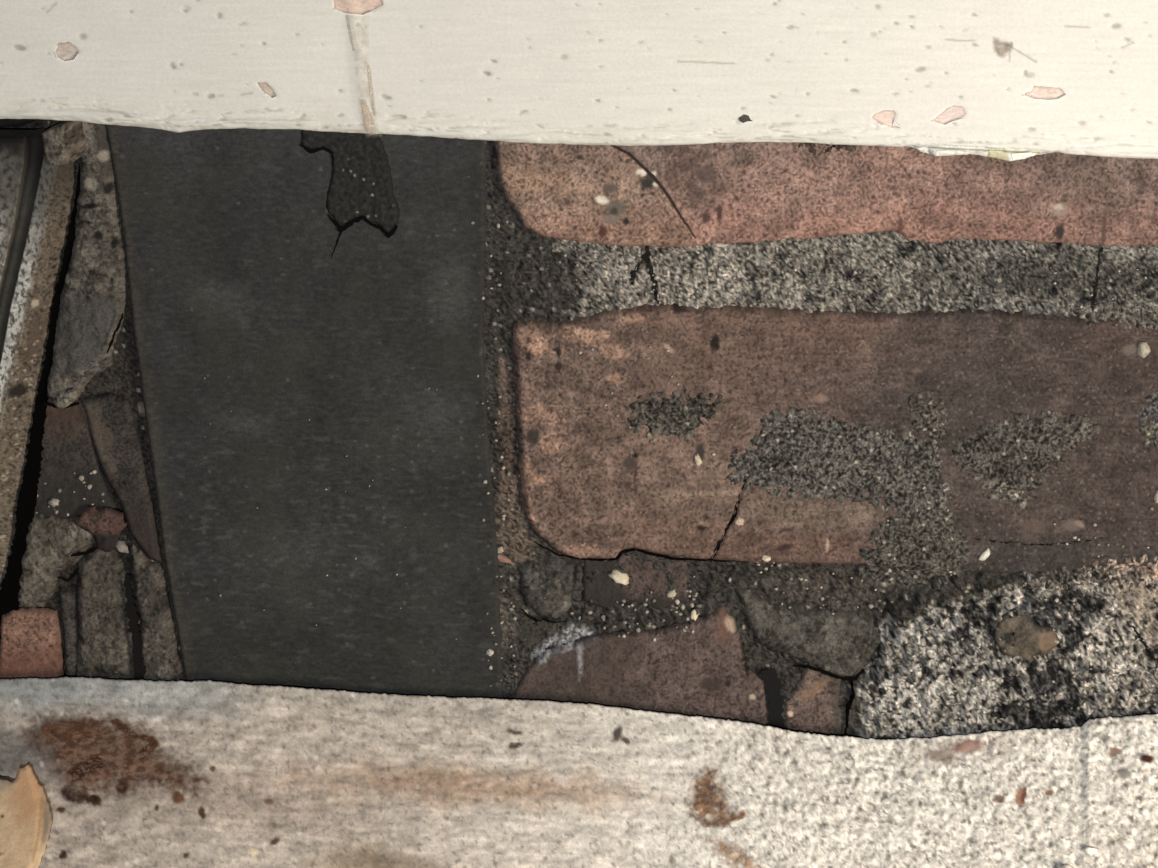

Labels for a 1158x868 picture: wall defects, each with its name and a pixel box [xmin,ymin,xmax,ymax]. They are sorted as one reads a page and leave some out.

spalling [300,130,400,258]
crack [630,246,660,305]
crack [534,476,748,563]
rust [24,714,209,803]
rust [690,768,745,826]
rust [710,840,752,868]